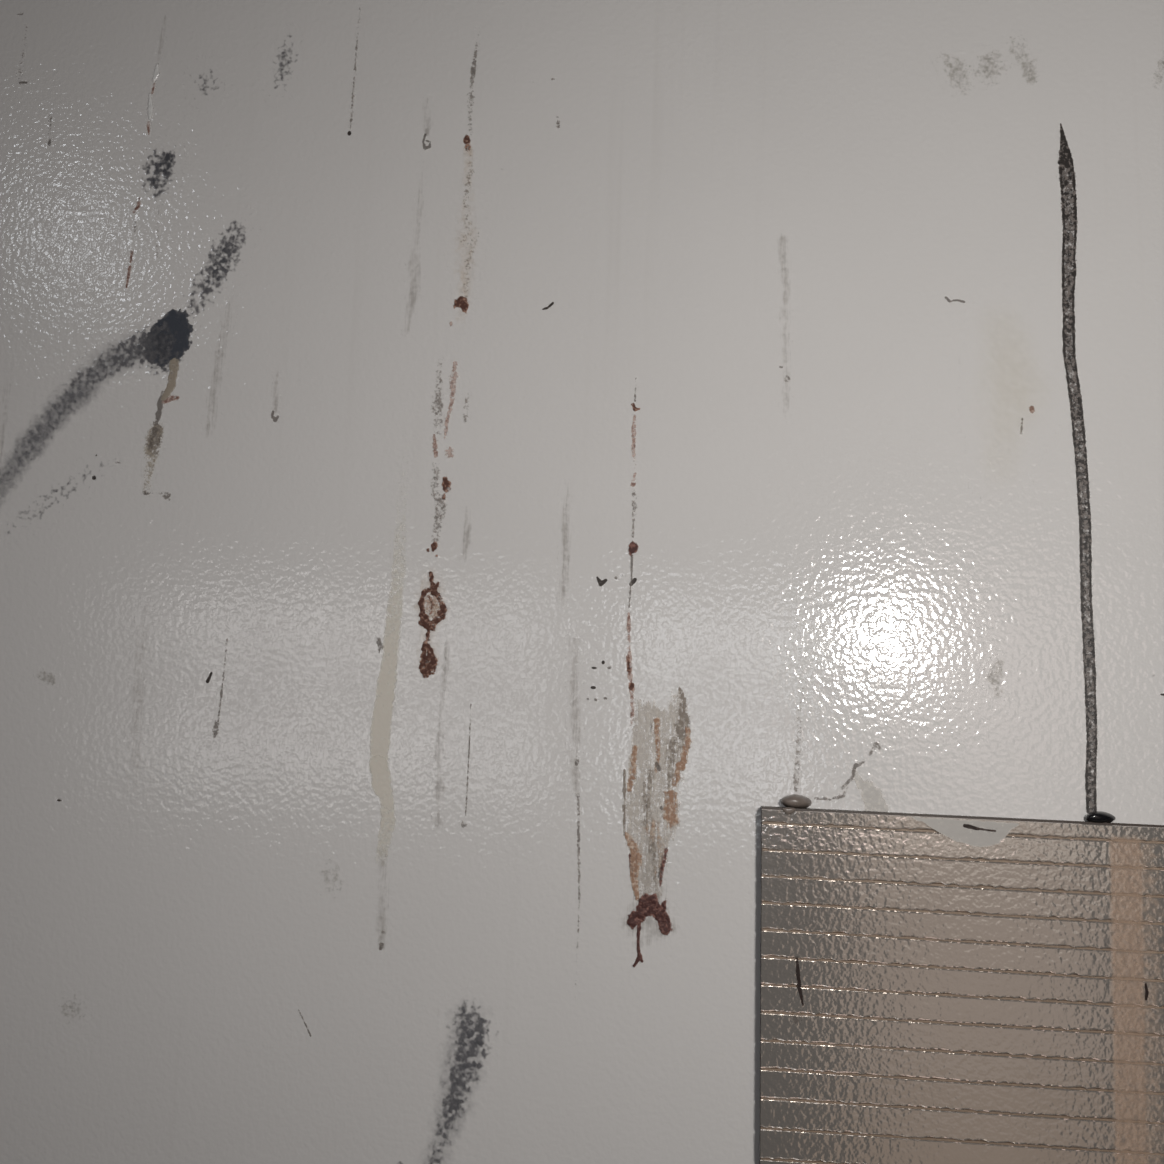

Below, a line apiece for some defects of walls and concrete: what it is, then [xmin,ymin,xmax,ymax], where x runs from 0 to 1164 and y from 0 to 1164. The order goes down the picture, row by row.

corrosion [453,296,469,312]
damp [143,358,179,499]
corrosion [432,362,467,457]
corrosion [631,395,640,457]
corrosion [427,471,451,557]
corrosion [418,571,447,678]
corrosion [626,473,638,717]
damp [369,554,404,854]
peeling [622,687,691,967]